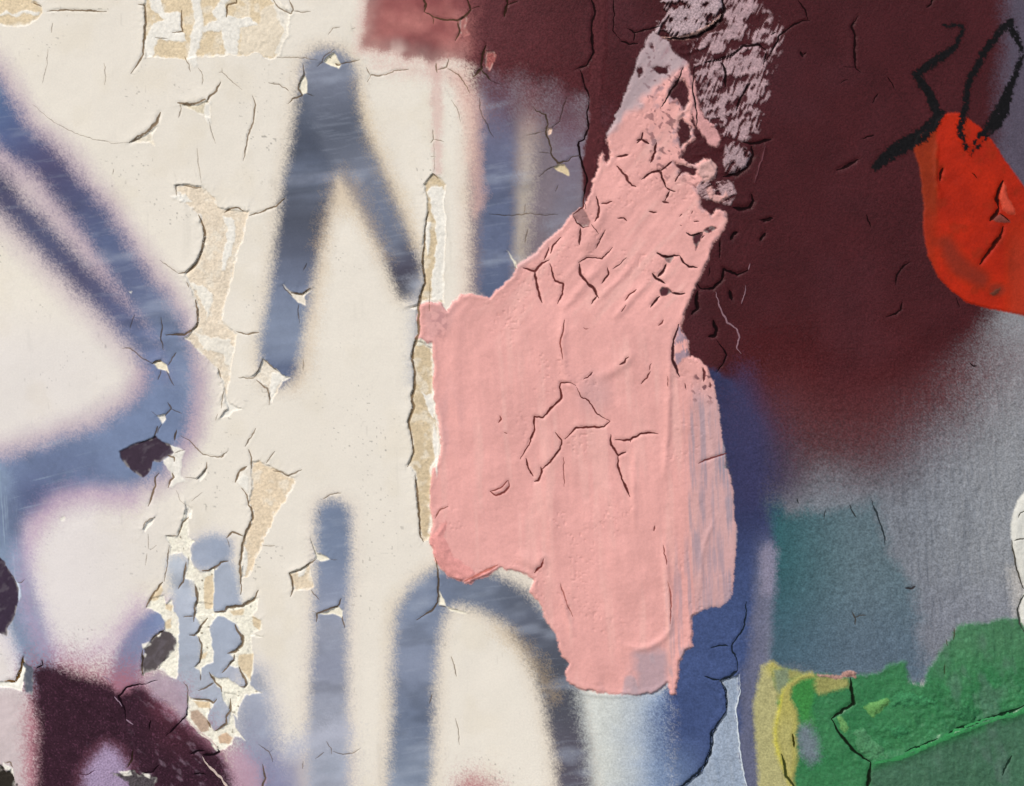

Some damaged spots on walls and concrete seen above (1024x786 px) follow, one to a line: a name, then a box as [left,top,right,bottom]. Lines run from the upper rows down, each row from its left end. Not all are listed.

peeling [122,347,176,385]
peeling [160,183,290,420]
peeling [131,0,358,104]
peeling [406,173,448,543]
crack [435,59,493,136]
crack [490,186,658,497]
crack [576,0,810,226]
crack [619,138,773,388]
crack [841,16,860,83]
crack [972,173,1016,265]
peeling [118,403,302,752]
peeling [417,559,470,620]